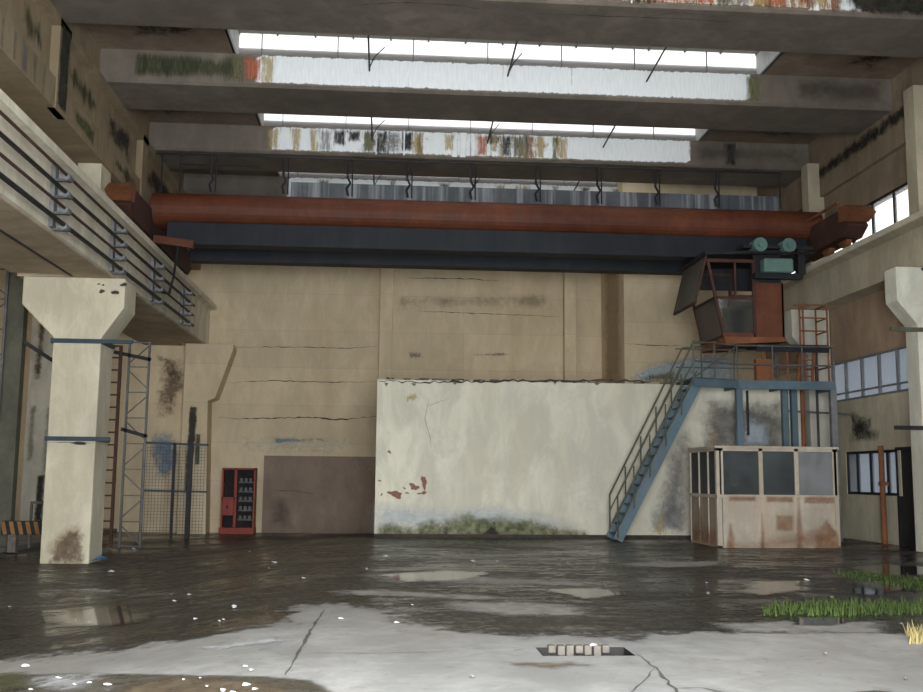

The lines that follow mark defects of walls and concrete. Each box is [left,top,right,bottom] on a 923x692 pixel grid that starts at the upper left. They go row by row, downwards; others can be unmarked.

damp [849,0,923,15]
damp [137,54,759,101]
damp [819,106,904,177]
peeling [381,476,427,499]
damp [0,512,923,660]
crack [285,610,324,675]
damp [0,673,329,692]
crack [631,654,722,692]